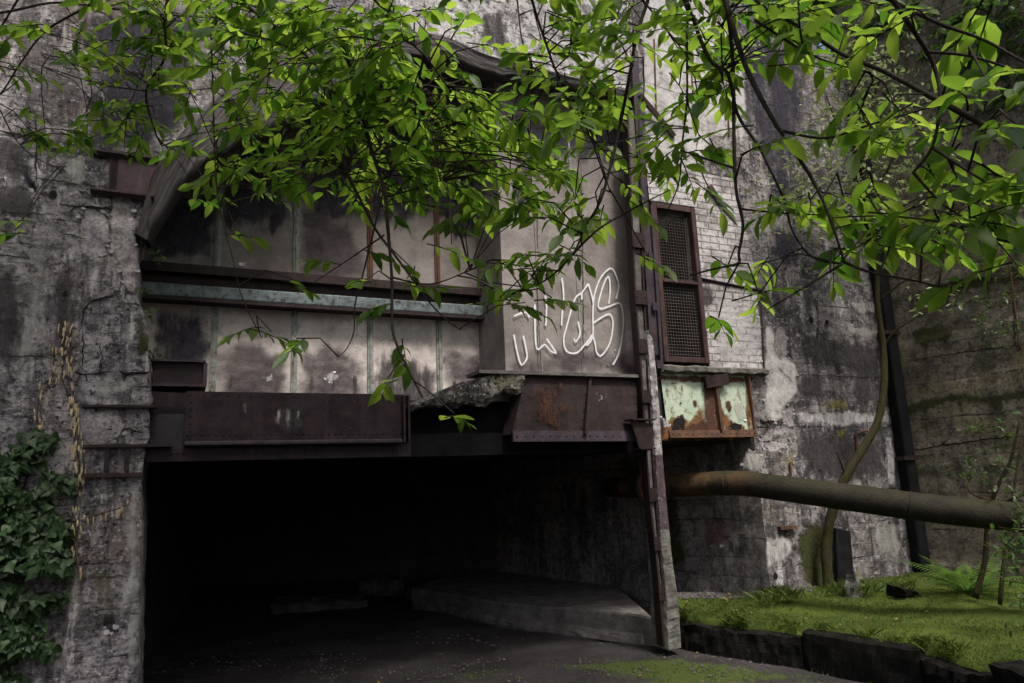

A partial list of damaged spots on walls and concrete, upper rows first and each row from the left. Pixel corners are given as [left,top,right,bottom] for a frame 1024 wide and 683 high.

water stain [150,190,238,260]
water stain [303,210,362,276]
crack [74,295,150,382]
corrosion [658,374,753,441]
water stain [798,325,895,484]